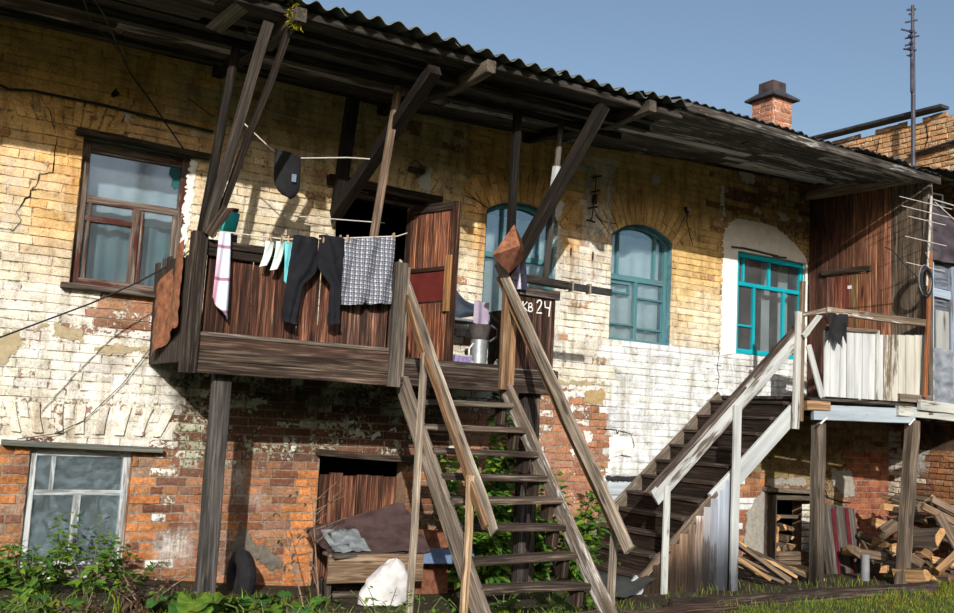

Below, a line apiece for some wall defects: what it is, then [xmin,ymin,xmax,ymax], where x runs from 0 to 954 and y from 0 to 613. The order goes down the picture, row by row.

crack [0,96,76,231]
peeling [0,322,84,365]
peeling [94,329,149,356]
spalling [558,379,606,413]
peeling [831,468,856,498]